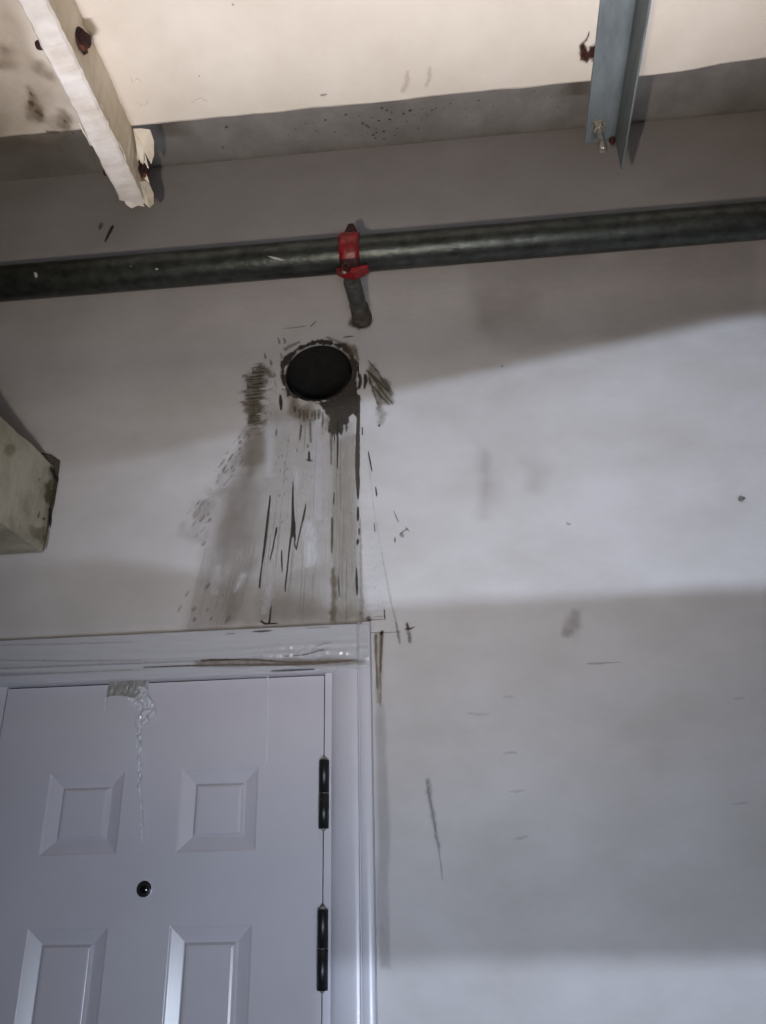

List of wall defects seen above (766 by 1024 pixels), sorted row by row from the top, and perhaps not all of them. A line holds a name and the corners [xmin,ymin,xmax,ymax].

corrosion [580,33,595,63]